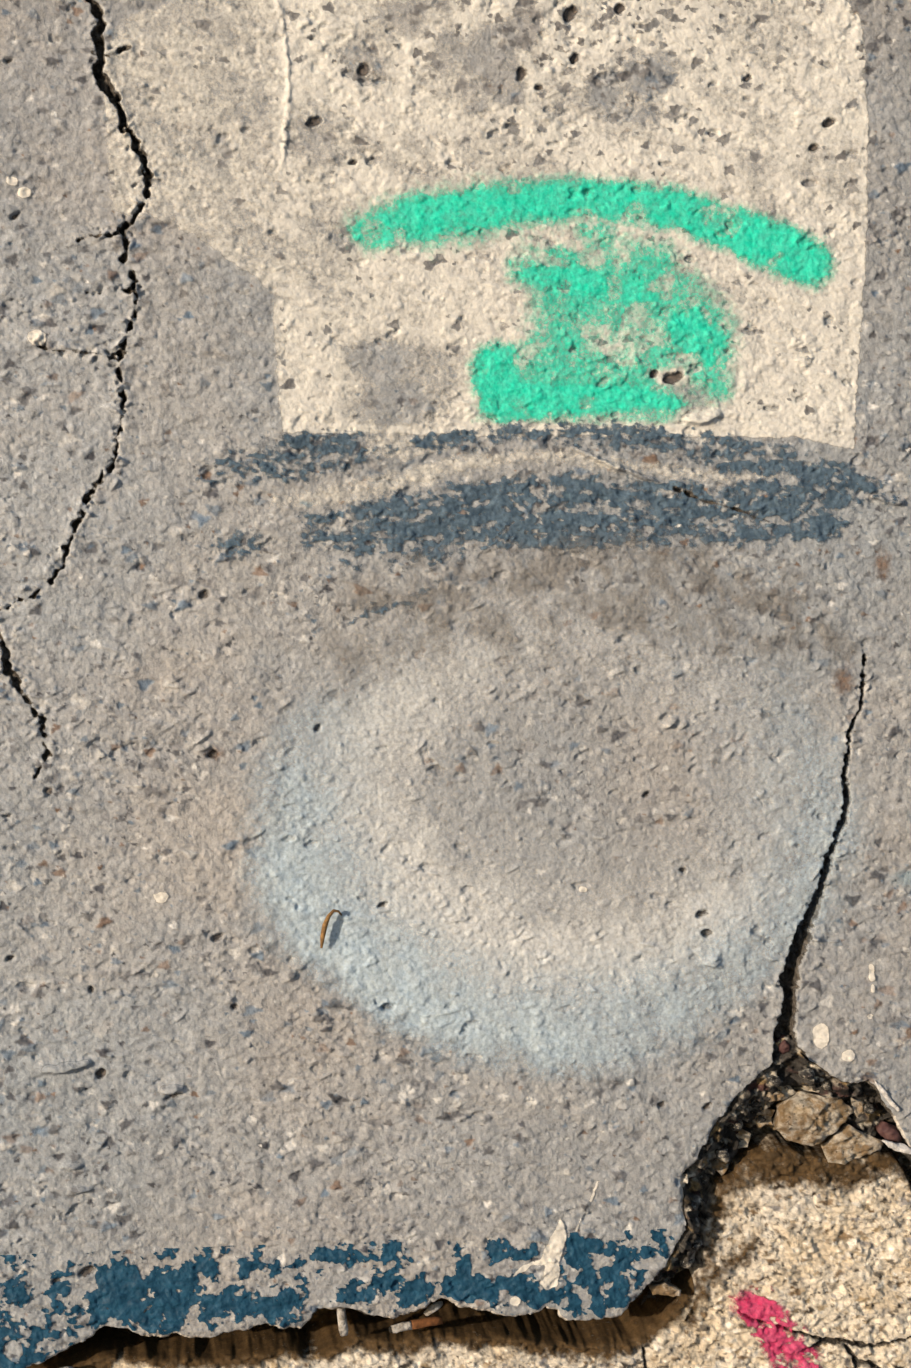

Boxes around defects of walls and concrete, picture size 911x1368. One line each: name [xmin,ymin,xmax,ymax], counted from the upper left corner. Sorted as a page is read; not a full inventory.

crack [0,0,154,779]
crack [772,654,867,1057]
peeling [0,1033,911,1368]
crack [757,1319,911,1368]